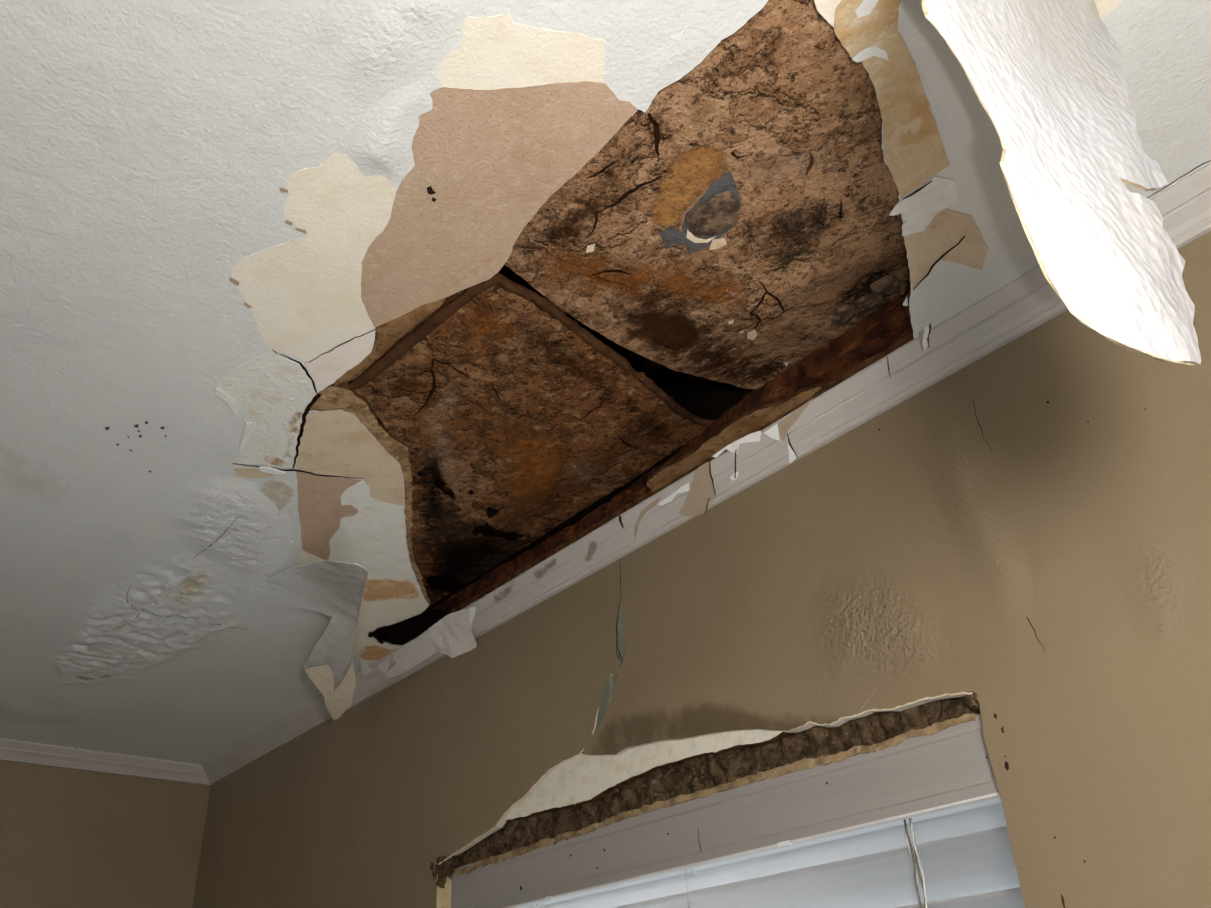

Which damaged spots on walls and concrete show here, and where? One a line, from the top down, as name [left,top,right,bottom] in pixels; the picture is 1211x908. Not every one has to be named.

peeling [852,45,889,63]
peeling [650,145,741,253]
peeling [889,176,958,236]
peeling [215,14,637,581]
crack [232,329,376,479]
peeling [634,398,813,538]
peeling [360,606,477,678]
damp [581,697,854,755]
flaking render [430,691,1004,888]